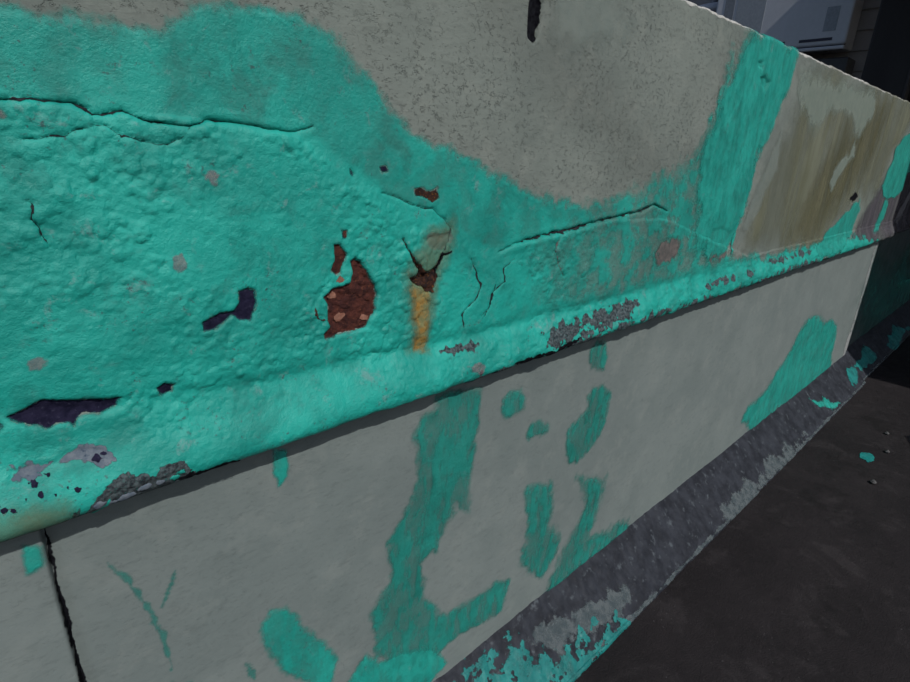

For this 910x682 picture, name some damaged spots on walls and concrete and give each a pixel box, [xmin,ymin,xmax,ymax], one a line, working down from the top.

crack [527,0,542,42]
crack [6,97,222,145]
water stain [750,71,910,250]
crack [521,205,652,274]
peeling [655,238,680,265]
peeling [202,288,257,331]
corrosion [403,238,452,349]
crack [439,258,511,356]
peeling [541,247,836,357]
peeling [0,397,120,429]
peeling [11,443,117,498]
peeling [64,461,196,522]